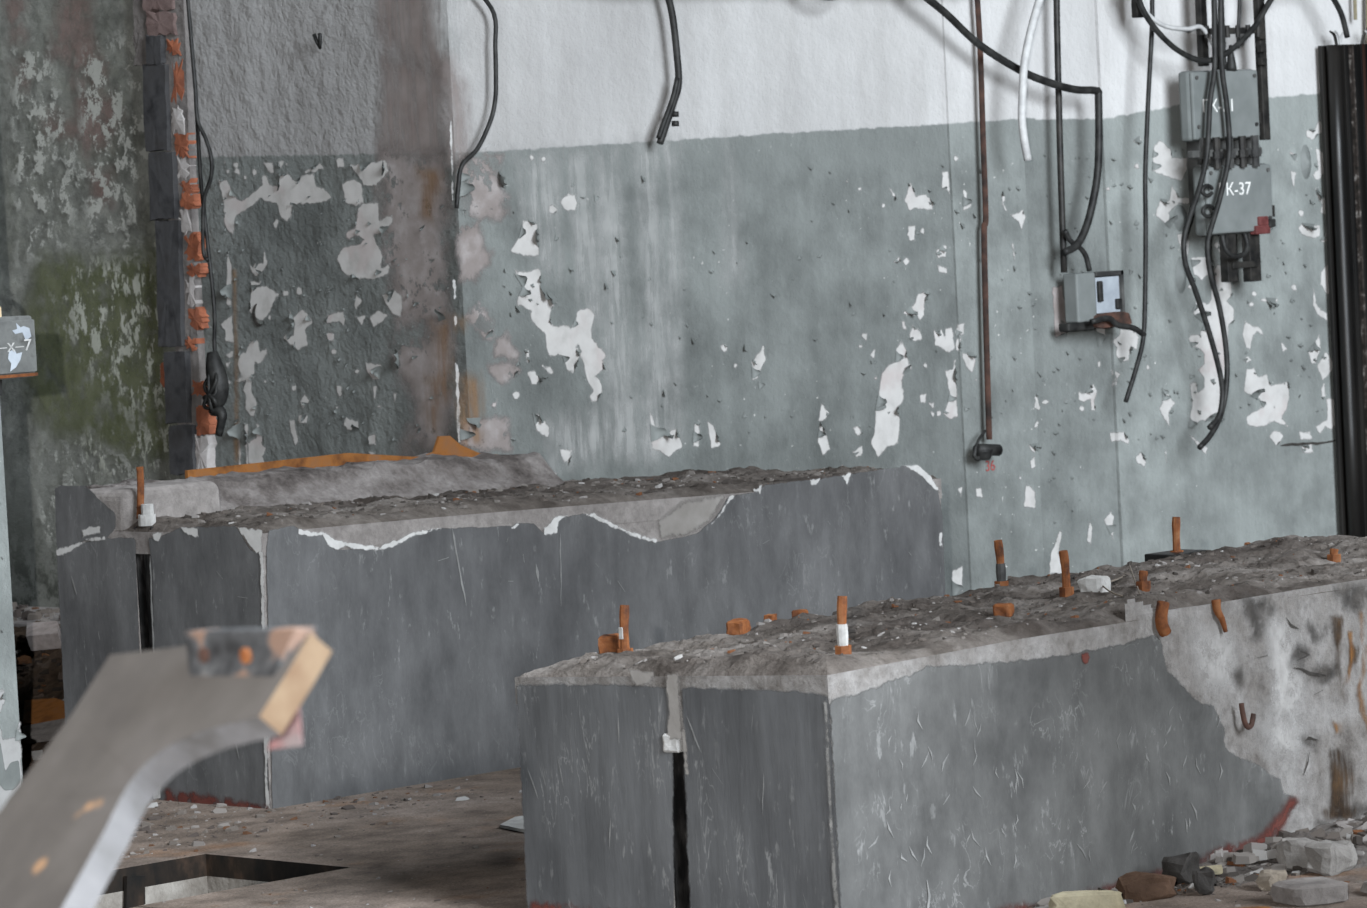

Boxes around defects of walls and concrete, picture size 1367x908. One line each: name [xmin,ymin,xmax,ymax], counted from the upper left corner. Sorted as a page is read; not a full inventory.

leakage [378,0,463,157]
leakage [13,1,171,539]
peeling [212,122,606,465]
peeling [851,289,992,457]
spalling [298,528,438,550]
spalling [544,516,565,535]
spalling [586,495,734,543]
corrosion [1155,600,1171,637]
corrosion [1211,599,1228,632]
spalling [1125,579,1367,833]
corrosion [1348,633,1367,723]
peeling [0,722,26,811]